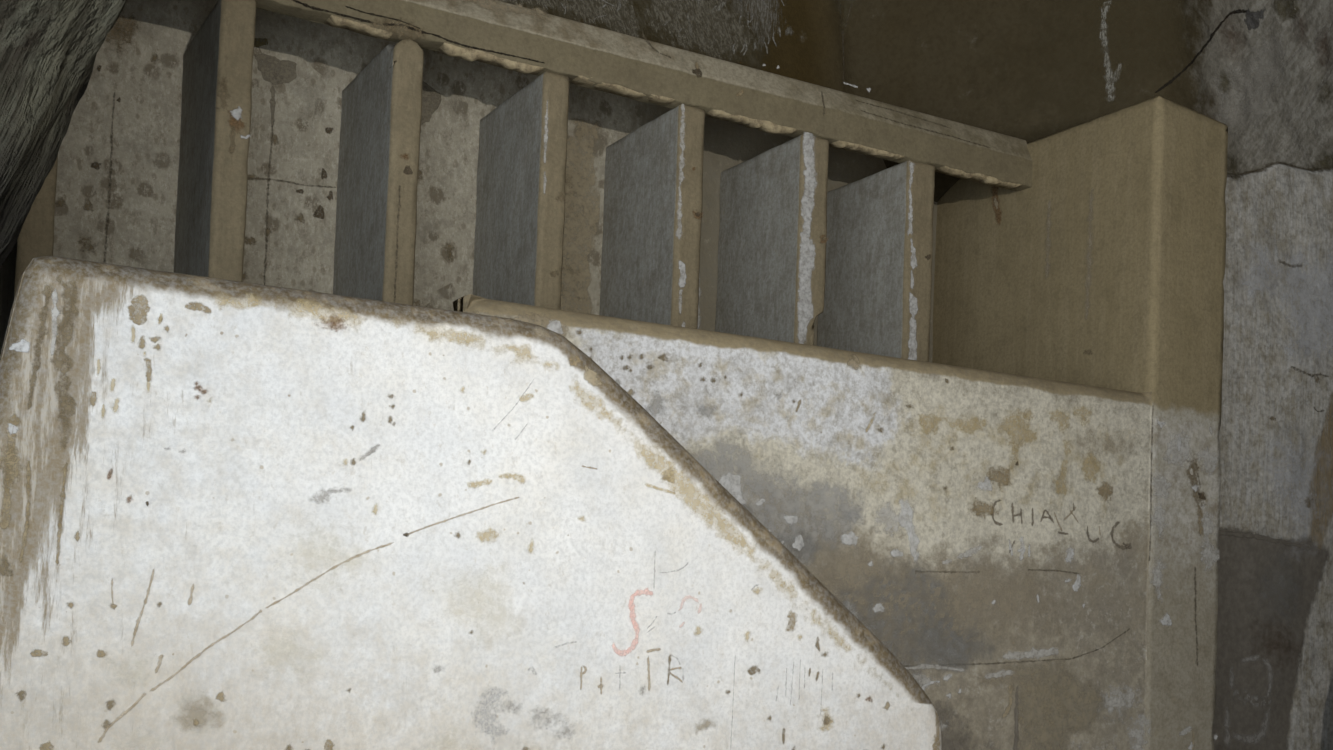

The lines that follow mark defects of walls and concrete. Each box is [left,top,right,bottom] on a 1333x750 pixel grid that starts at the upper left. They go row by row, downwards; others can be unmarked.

crack [293,0,544,63]
spalling [500,0,780,68]
crack [1155,9,1266,93]
damp [0,277,118,576]